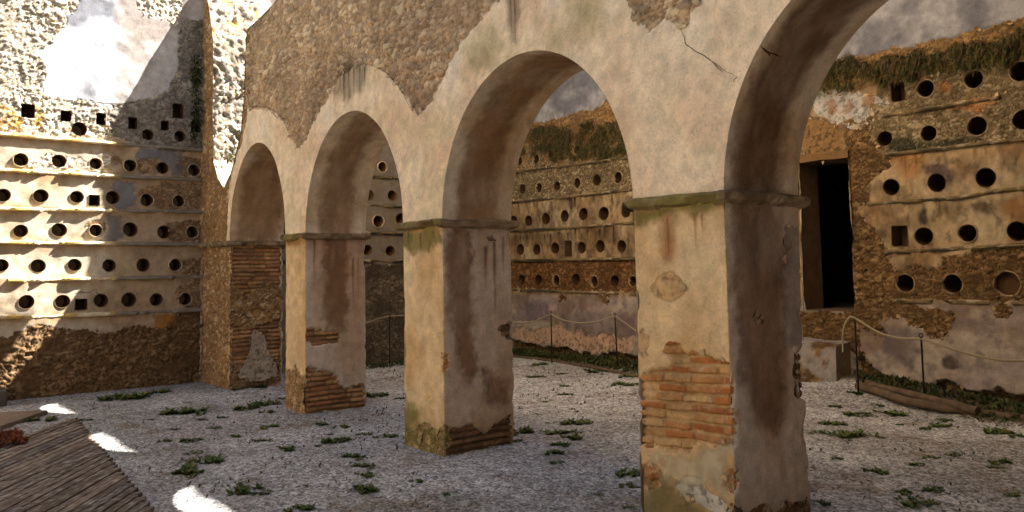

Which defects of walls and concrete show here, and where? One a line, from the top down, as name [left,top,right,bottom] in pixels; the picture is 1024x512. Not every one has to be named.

spalling [627,0,702,33]
crack [681,30,737,82]
spalling [0,0,500,414]
spalling [799,17,1024,375]
damp [446,229,495,304]
flaking render [404,413,515,457]
flaking render [639,341,740,454]
spalling [932,379,1024,401]